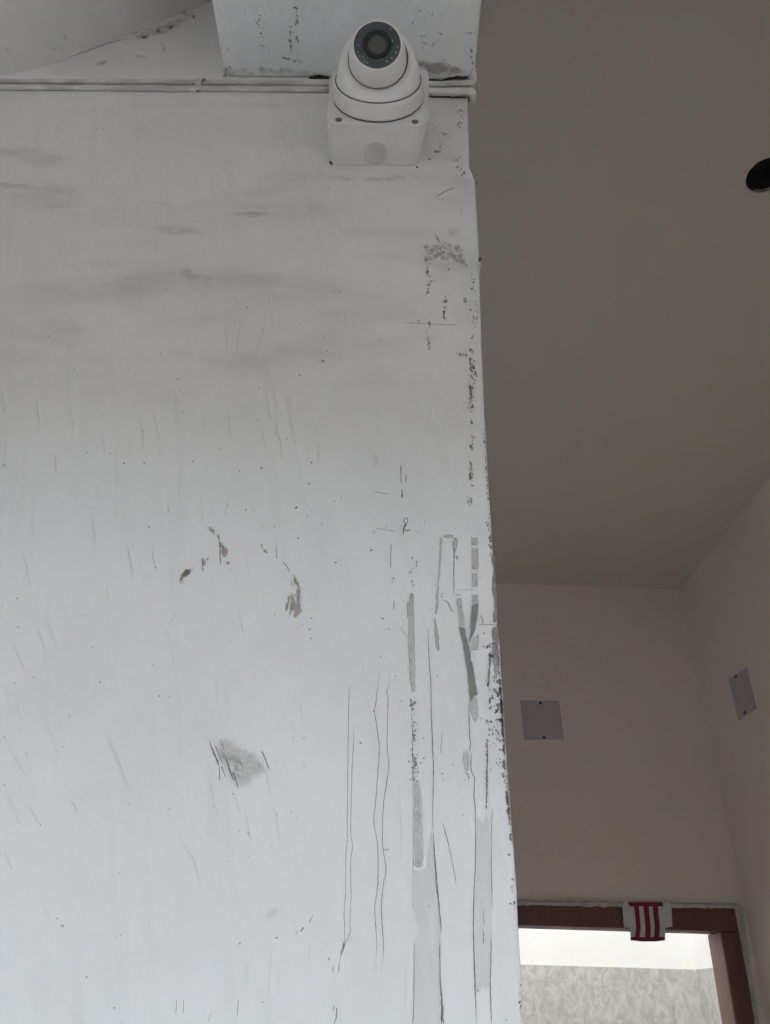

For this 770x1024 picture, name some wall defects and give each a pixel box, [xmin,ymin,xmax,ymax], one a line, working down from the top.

water stain [209,740,243,787]
crack [328,604,444,1024]
peeling [401,557,425,868]
peeling [431,513,512,841]